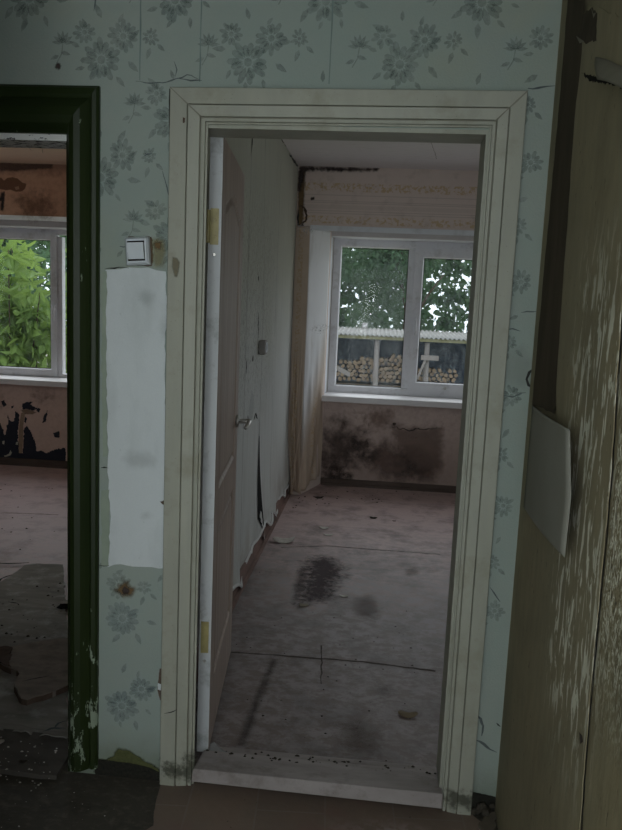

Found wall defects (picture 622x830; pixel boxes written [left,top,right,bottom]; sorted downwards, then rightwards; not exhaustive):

peeling [0,400,66,461]
water stain [321,420,435,481]
water stain [298,557,348,602]